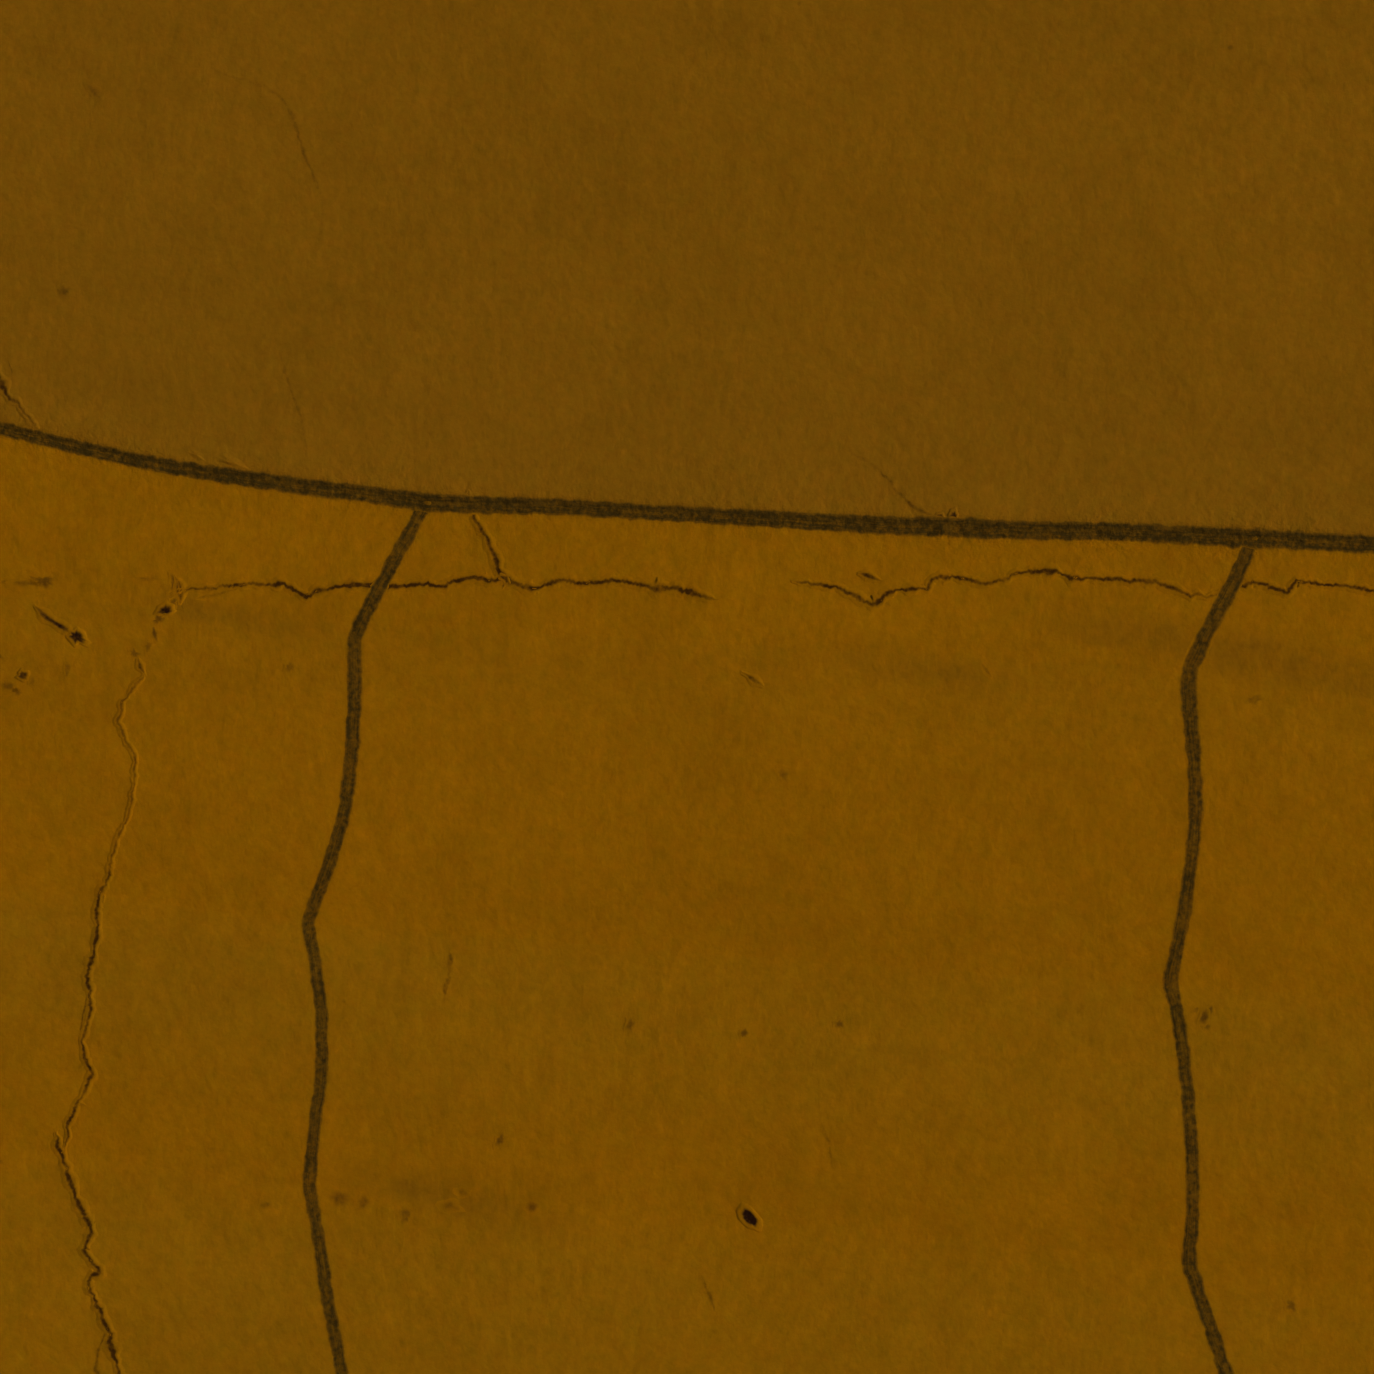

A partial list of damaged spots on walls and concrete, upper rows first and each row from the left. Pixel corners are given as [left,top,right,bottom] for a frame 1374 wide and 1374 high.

crack [0,360,40,429]
crack [166,490,721,605]
crack [791,561,1374,613]
crack [50,673,147,1374]